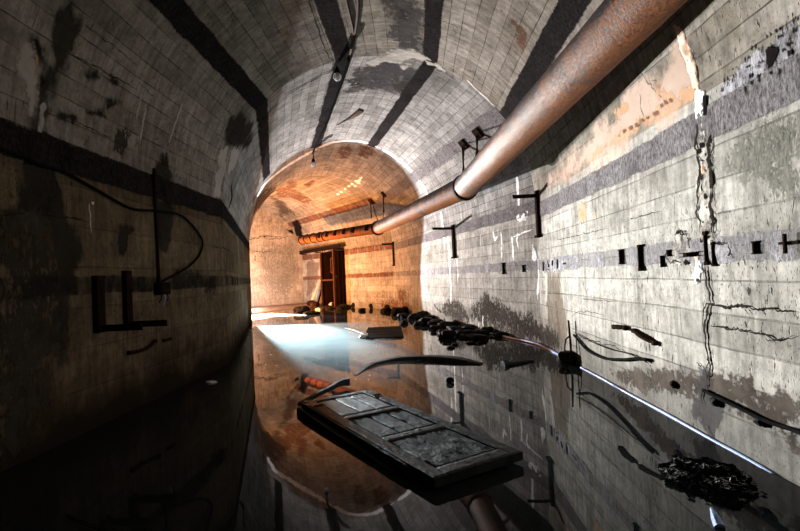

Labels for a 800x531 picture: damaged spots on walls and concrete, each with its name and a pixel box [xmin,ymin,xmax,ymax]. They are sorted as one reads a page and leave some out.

damp [17,1,82,133]
spalling [721,16,800,97]
damp [213,111,254,210]
crack [694,124,721,245]
damp [434,236,567,352]
crack [698,265,797,389]